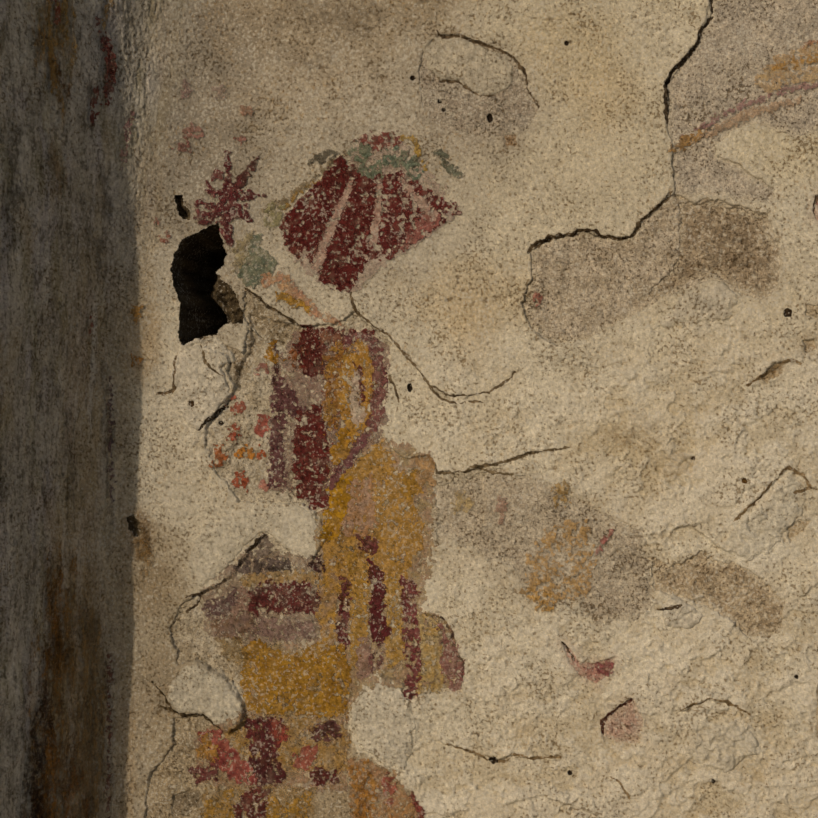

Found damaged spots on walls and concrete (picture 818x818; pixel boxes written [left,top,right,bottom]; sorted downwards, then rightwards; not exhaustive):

crack [436,30,540,109]
crack [663,0,714,124]
crack [527,190,673,254]
flaking render [522,0,818,344]
crack [349,280,516,404]
crack [434,446,570,476]
flaking render [146,311,785,818]
corrosion [20,542,115,818]